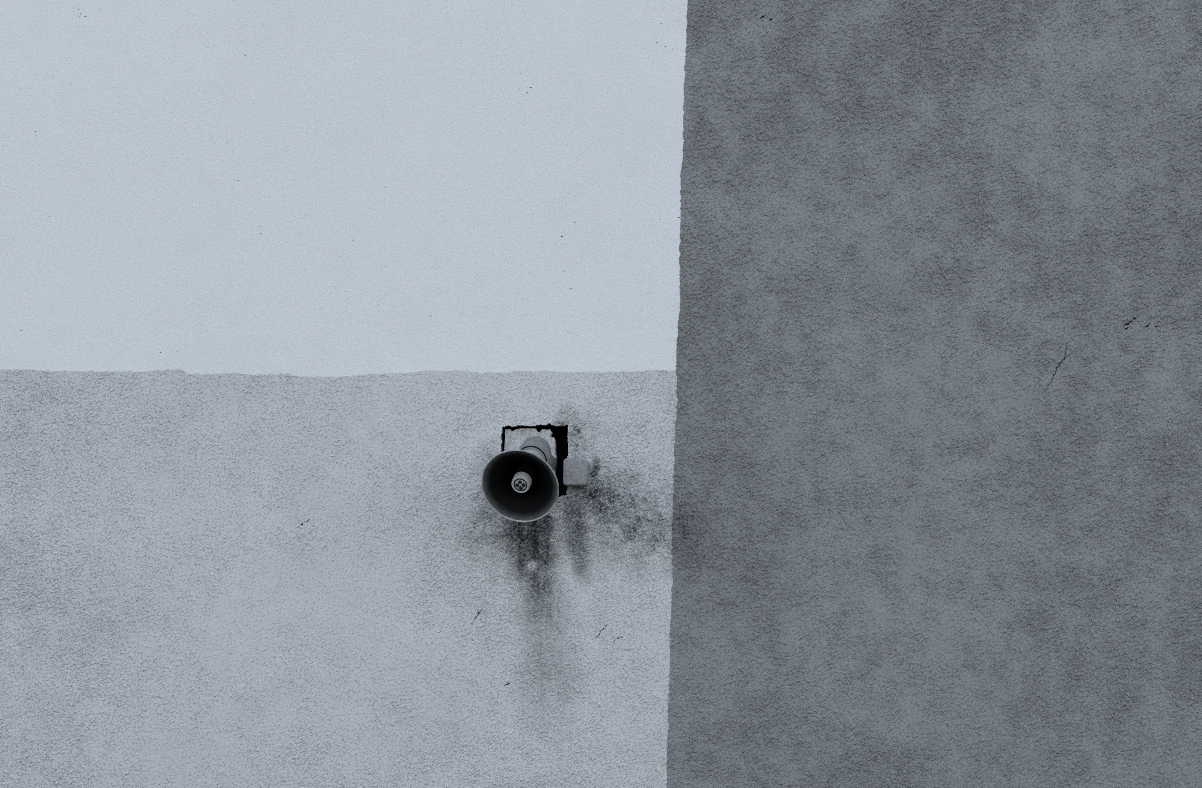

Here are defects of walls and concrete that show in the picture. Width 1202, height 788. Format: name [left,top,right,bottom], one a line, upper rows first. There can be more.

damp [512,513,552,594]